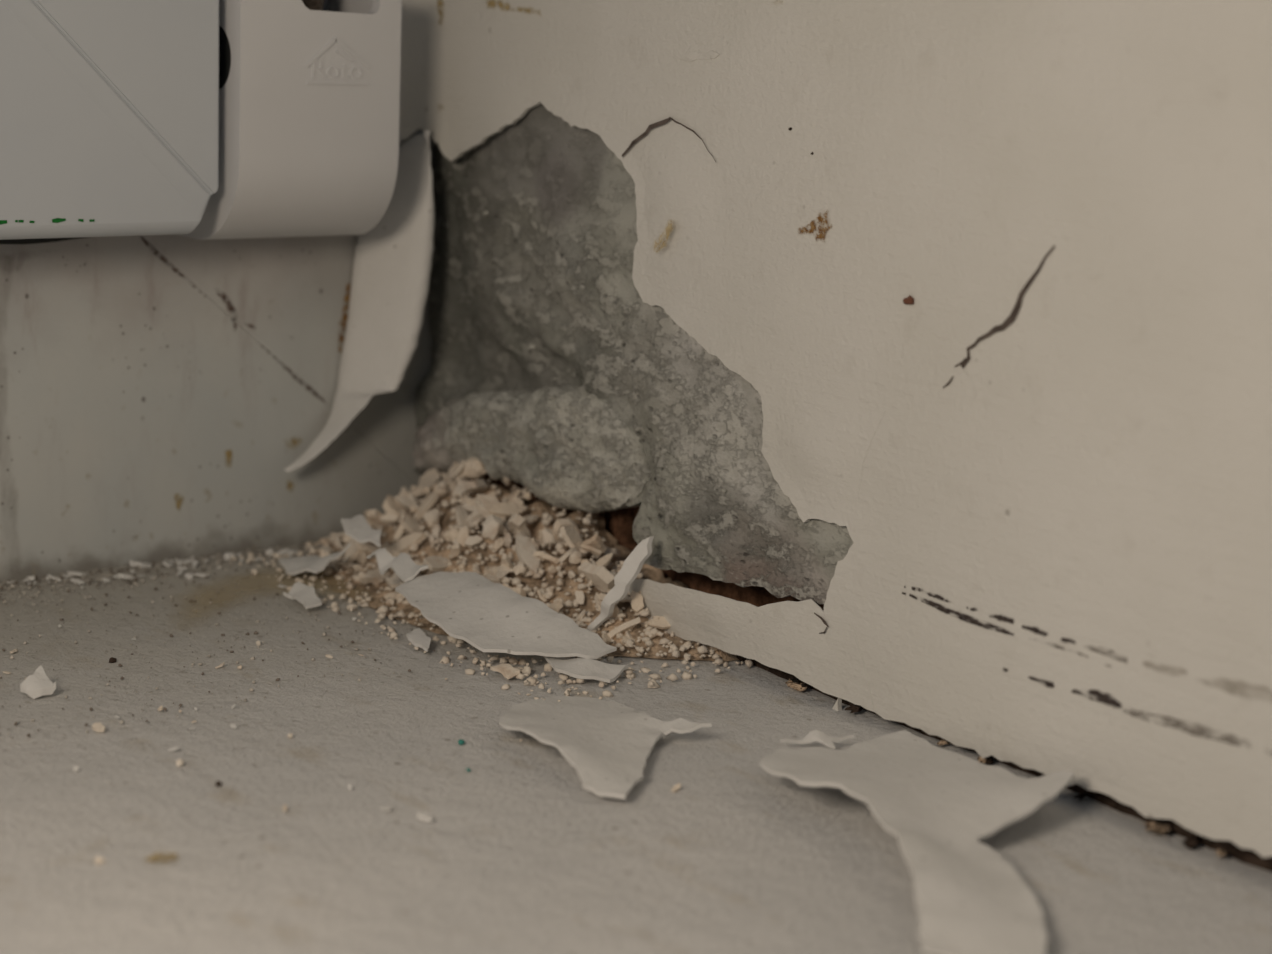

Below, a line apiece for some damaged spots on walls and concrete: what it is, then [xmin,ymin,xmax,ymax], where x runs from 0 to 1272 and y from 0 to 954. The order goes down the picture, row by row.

crack [622,117,716,162]
rust [798,211,832,240]
crack [942,246,1055,388]
spalling [279,104,874,709]
crack [736,655,1272,872]